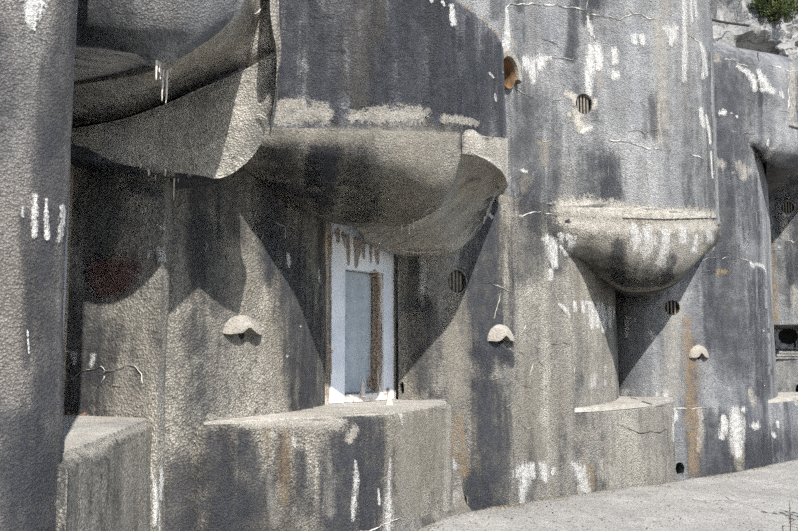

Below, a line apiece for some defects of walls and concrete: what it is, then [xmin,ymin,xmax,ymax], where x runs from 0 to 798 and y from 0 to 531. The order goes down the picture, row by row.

water stain [24,0,50,31]
water stain [273,0,514,148]
crack [505,0,652,62]
water stain [21,61,68,297]
water stain [0,307,102,531]
water stain [457,197,556,511]
water stain [692,388,796,476]